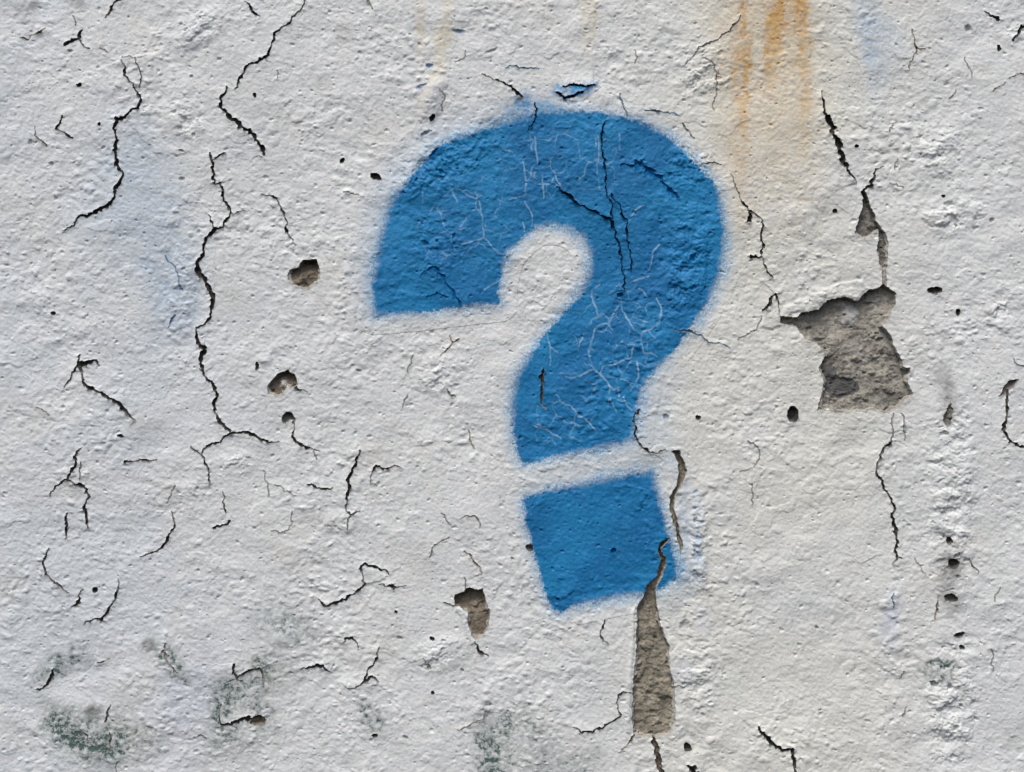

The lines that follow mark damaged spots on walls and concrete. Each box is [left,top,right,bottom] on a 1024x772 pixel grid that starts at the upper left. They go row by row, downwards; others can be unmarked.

crack [20,15,142,231]
crack [219,0,306,156]
corrosion [723,0,832,246]
crack [42,448,120,625]
crack [64,354,136,421]
crack [165,152,297,530]
spalling [456,601,490,645]
crack [406,50,780,454]
spalling [618,450,687,772]
spalling [780,166,913,414]
crack [875,413,926,574]
crack [758,726,797,772]